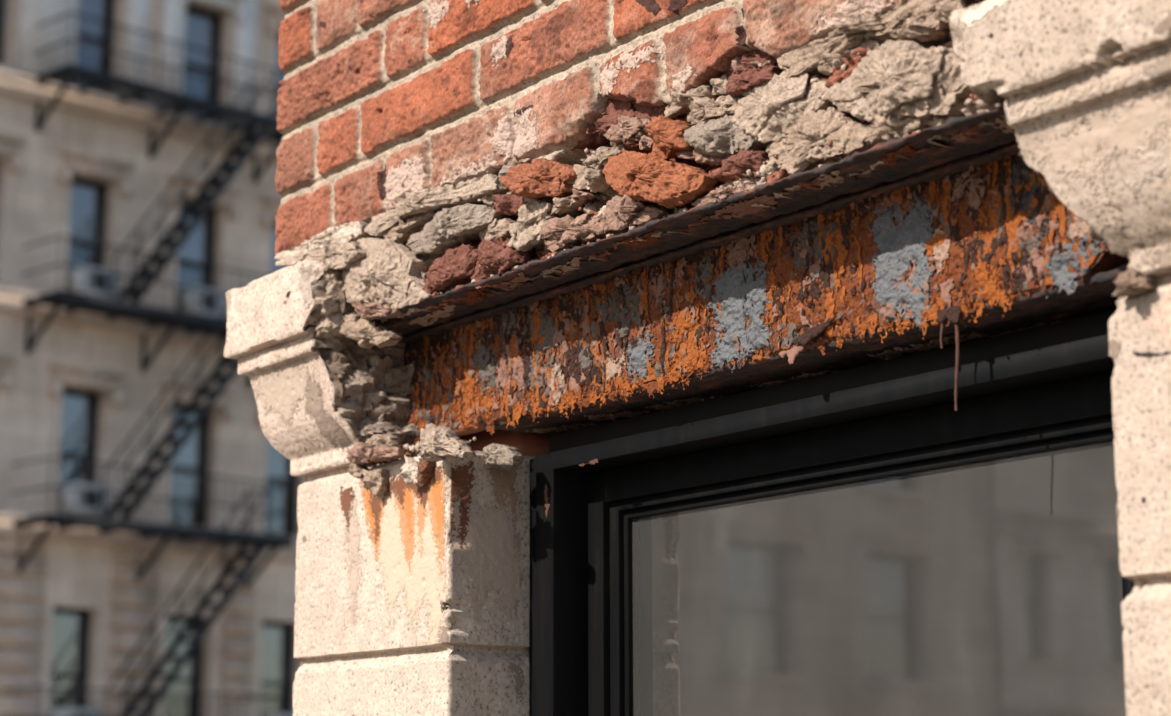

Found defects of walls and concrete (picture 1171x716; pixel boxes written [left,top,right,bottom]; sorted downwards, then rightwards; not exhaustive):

spalling [723,49,783,97]
spalling [571,98,770,209]
spalling [492,158,577,217]
spalling [283,262,321,310]
spalling [424,236,536,295]
rust [405,156,1099,445]
crack [1120,347,1171,358]
rust [339,459,525,652]